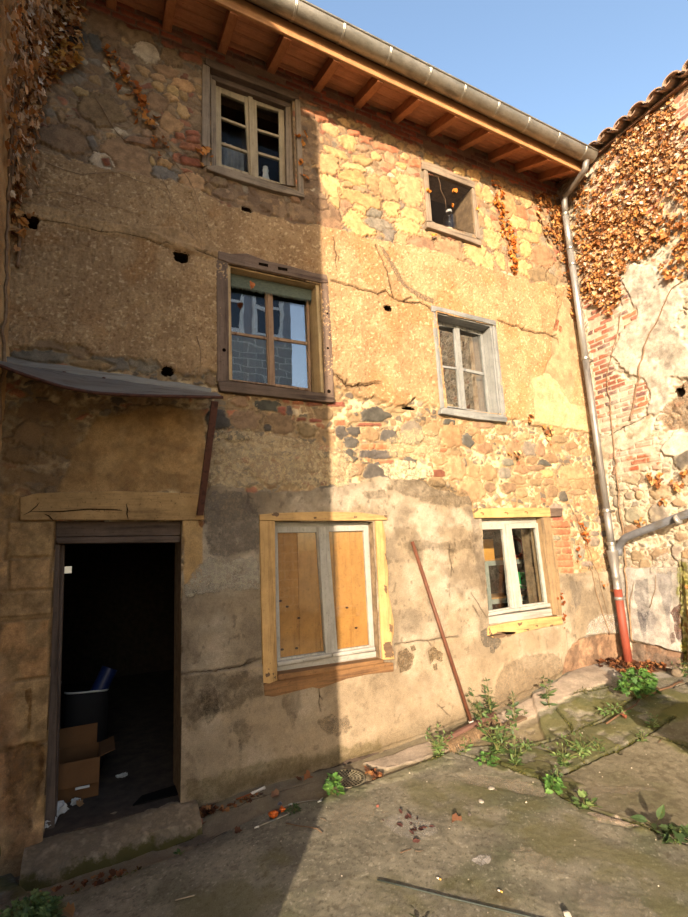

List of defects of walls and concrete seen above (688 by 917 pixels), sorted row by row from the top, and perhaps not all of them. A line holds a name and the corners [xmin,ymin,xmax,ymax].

crack [334,241,434,310]
spalling [660,381,688,432]